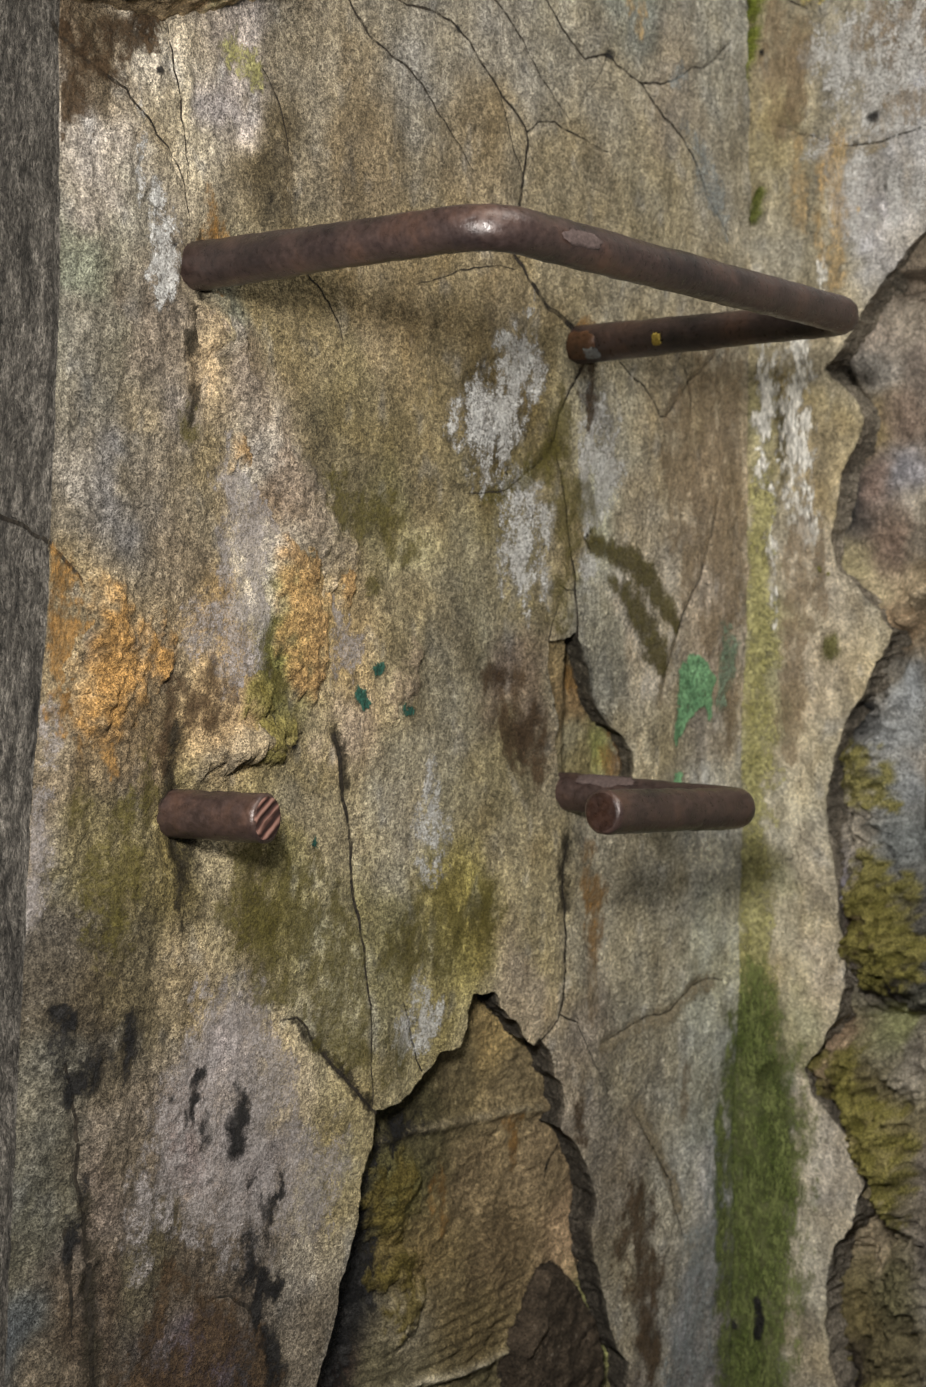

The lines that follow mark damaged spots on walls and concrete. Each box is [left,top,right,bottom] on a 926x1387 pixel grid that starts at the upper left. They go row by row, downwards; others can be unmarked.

crack [50,12,190,226]
crack [348,0,473,170]
crack [399,0,732,238]
crack [416,254,574,330]
rust [566,316,601,360]
water stain [447,308,554,617]
crack [280,727,422,1115]
water stain [61,1176,89,1267]
water stain [83,1009,137,1096]
peeling [168,1095,212,1146]
peeling [277,1169,286,1200]
spalling [316,992,629,1387]